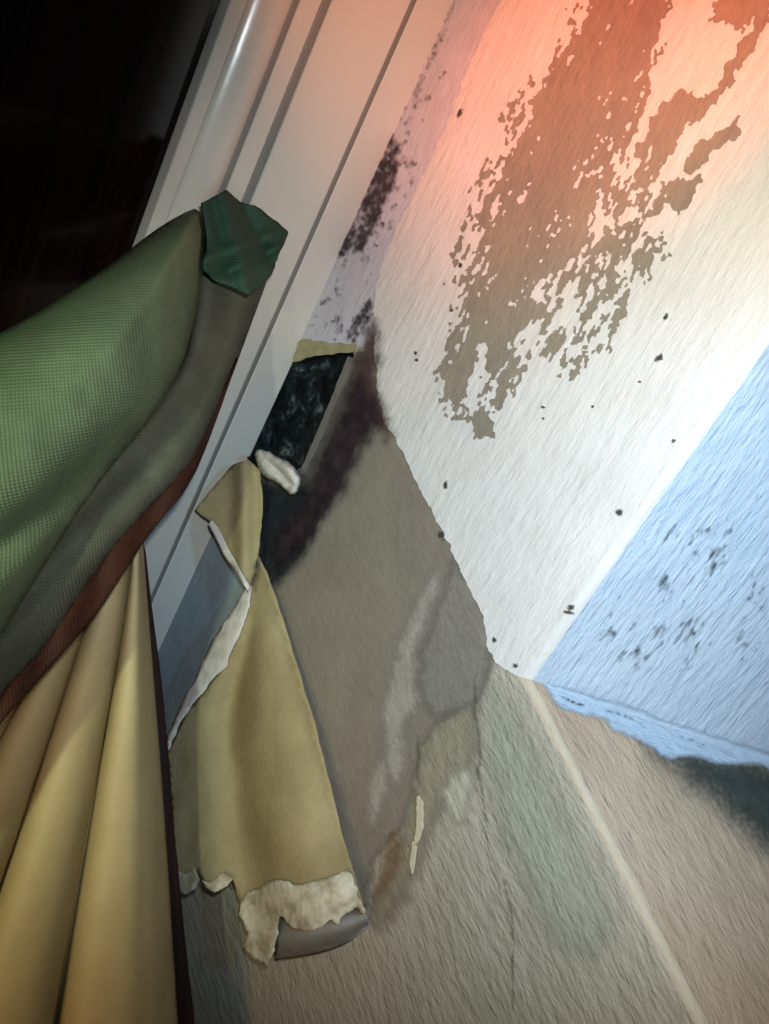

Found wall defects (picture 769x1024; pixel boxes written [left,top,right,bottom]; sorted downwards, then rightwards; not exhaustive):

leakage [339,135,415,256]
peeling [433,0,769,440]
leakage [258,299,388,585]
flaking render [247,339,496,928]
leakage [654,748,769,843]